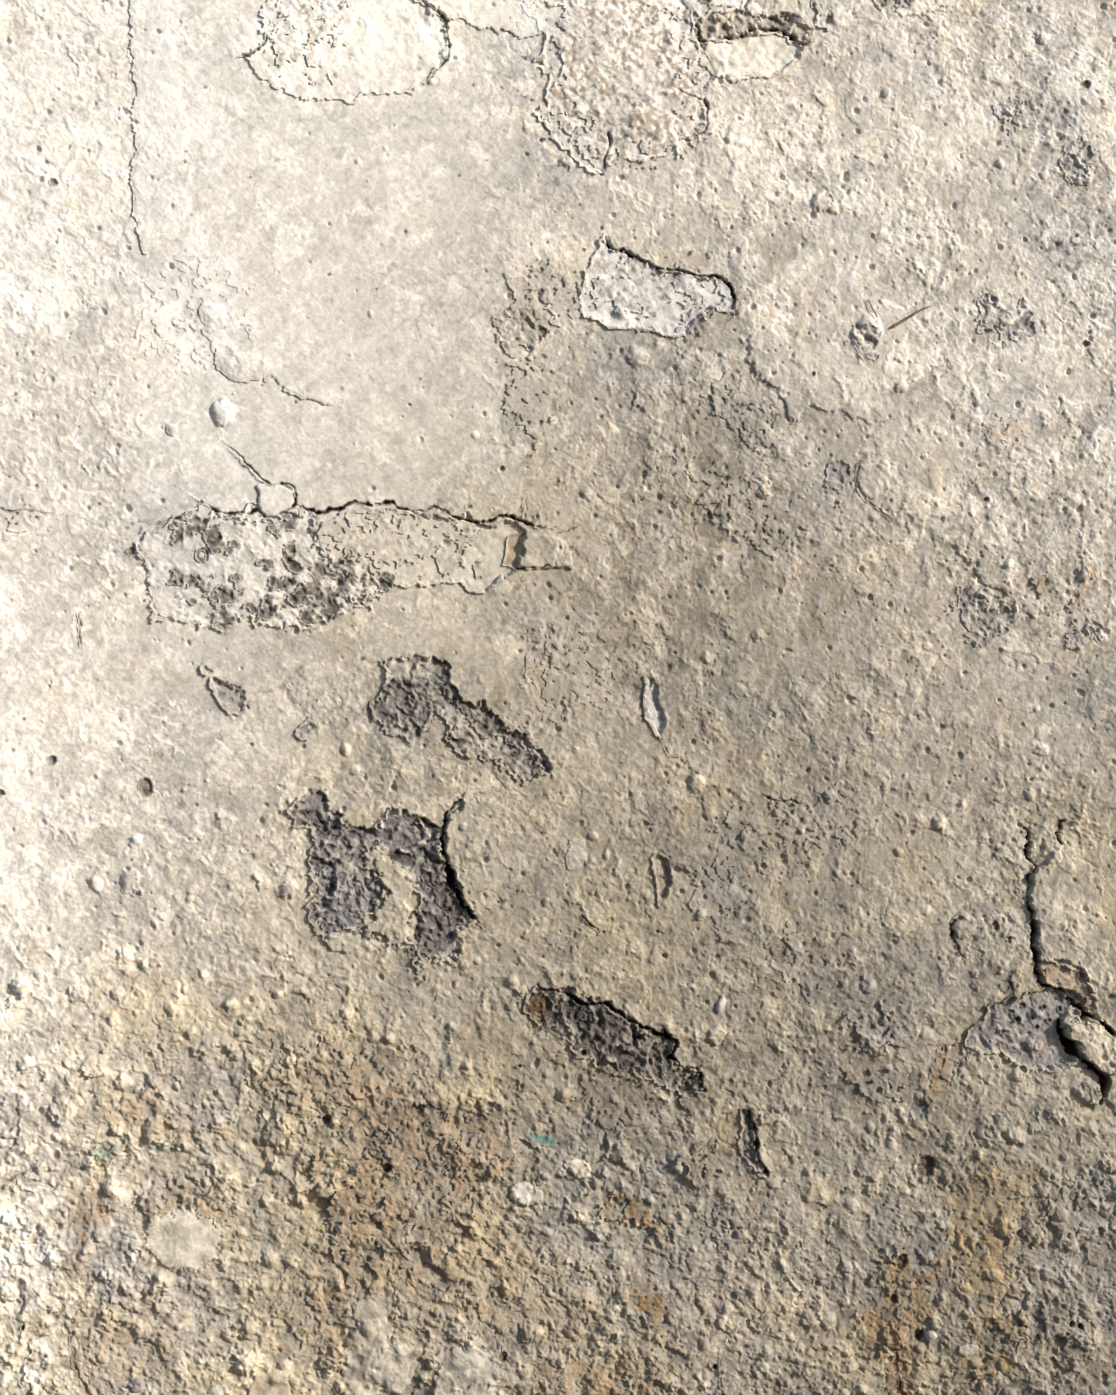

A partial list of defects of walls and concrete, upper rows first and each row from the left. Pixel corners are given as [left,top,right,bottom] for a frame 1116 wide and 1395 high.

peeling [243,0,815,175]
peeling [579,231,745,339]
peeling [127,482,574,633]
spalling [370,651,554,786]
spalling [286,788,542,981]
spalling [518,981,707,1098]
flaking render [951,851,1116,1121]
crack [1007,818,1116,1105]
flaking render [738,1107,801,1179]